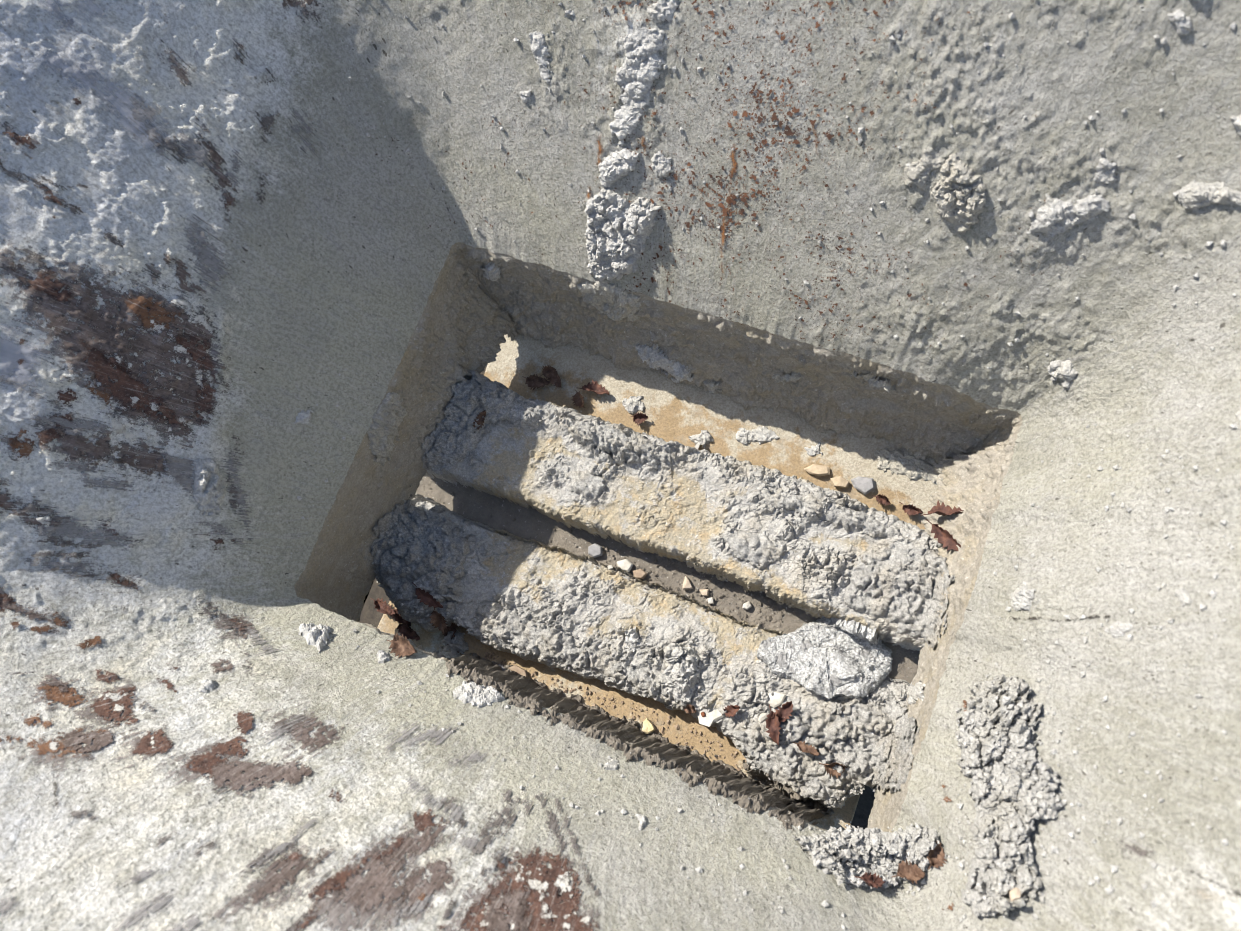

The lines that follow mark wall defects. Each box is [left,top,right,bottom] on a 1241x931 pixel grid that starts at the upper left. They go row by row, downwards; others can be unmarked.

corrosion [476,0,979,357]
corrosion [0,240,233,461]
spalling [804,464,875,495]
spalling [588,543,647,579]
spalling [683,576,714,604]
corrosion [210,652,258,674]
corrosion [0,668,314,799]
peeling [254,701,348,760]
spalling [642,718,655,734]
peeling [698,709,725,727]
peeling [758,691,787,724]
corrosion [437,813,606,931]